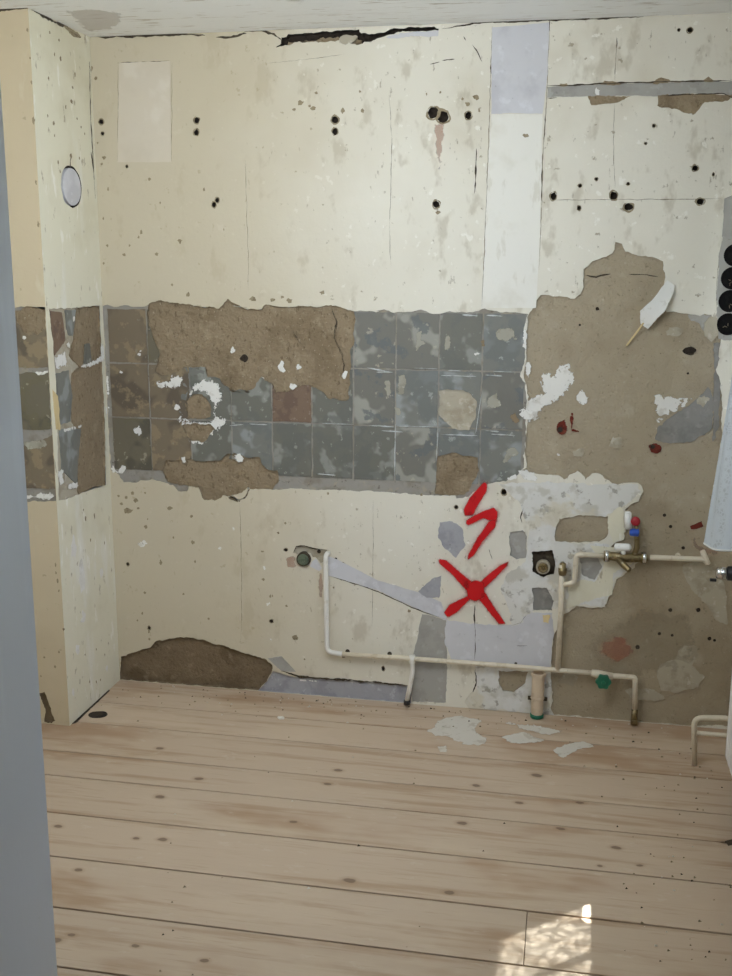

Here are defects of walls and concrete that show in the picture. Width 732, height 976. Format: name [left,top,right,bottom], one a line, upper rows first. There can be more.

crack [0,8,732,293]
flaking render [35,306,126,494]
flaking render [147,290,356,401]
flaking render [163,453,279,502]
flaking render [499,242,732,726]
flaking render [120,630,273,690]
peeling [465,666,532,713]